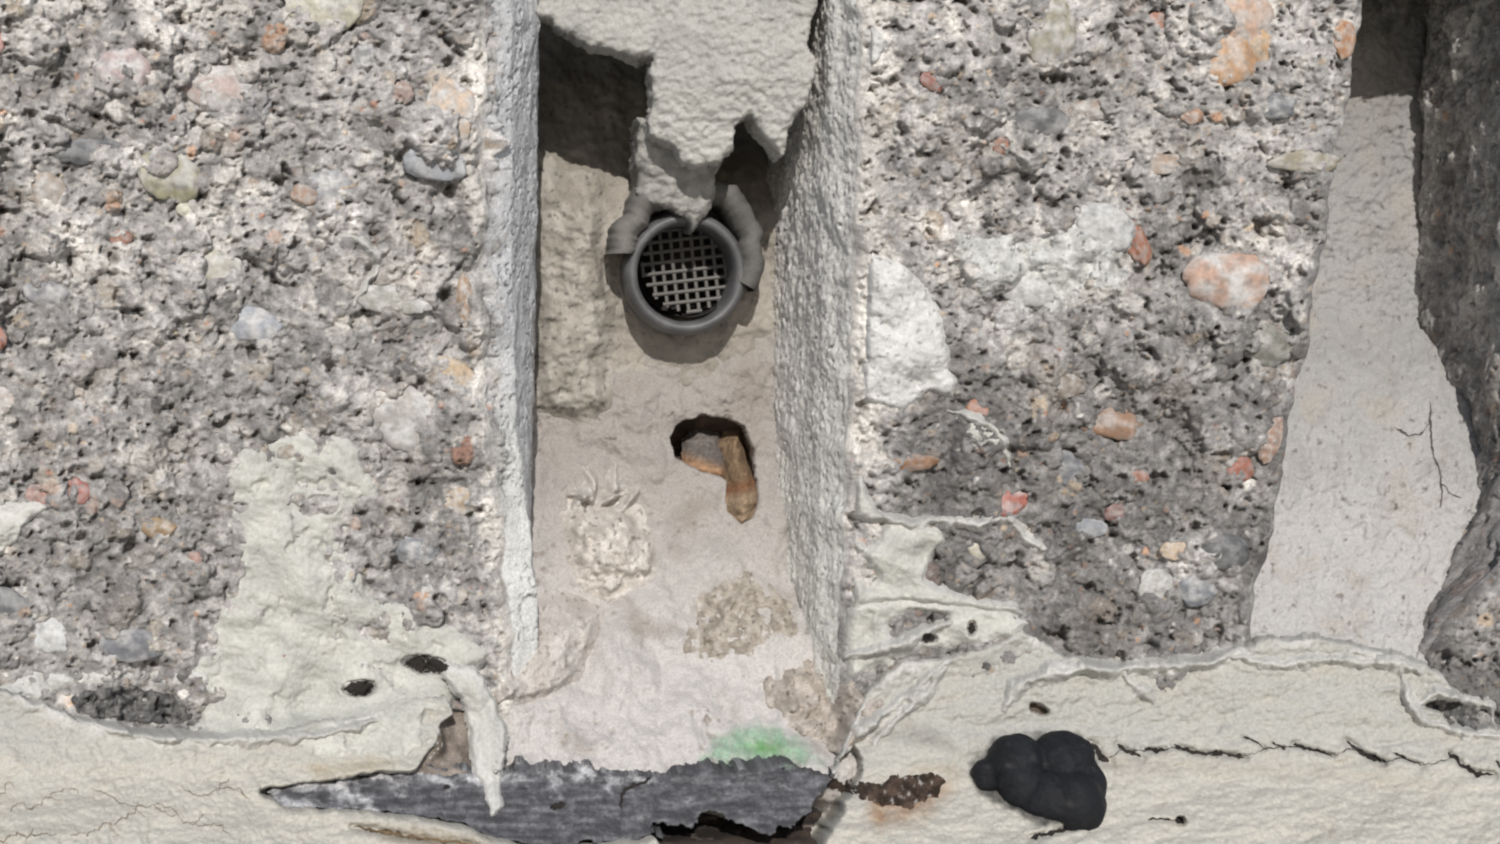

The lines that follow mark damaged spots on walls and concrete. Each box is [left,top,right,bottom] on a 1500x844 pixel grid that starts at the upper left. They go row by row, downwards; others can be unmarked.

crack [1091,736,1500,778]
crack [0,778,250,843]
hole [651,807,822,844]
corrosion [845,772,946,819]